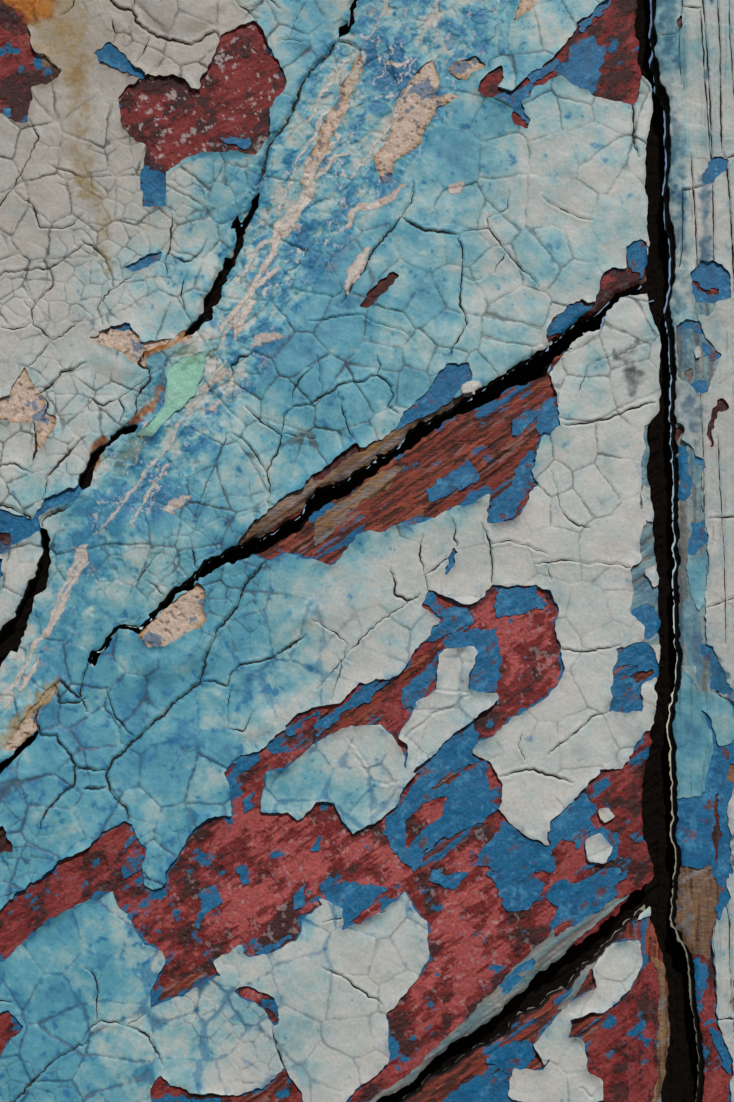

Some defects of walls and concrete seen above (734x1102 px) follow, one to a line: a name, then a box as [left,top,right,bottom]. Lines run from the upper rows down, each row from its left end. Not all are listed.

peeling [0,0,61,123]
rust [3,0,86,81]
peeling [94,22,287,207]
peeling [471,0,642,128]
crack [679,0,734,278]
crack [0,0,362,667]
crack [115,0,699,1102]
peeling [254,348,572,565]
peeling [609,425,661,713]
crack [700,394,734,643]
peeling [0,585,670,1102]
peeling [672,423,734,1102]